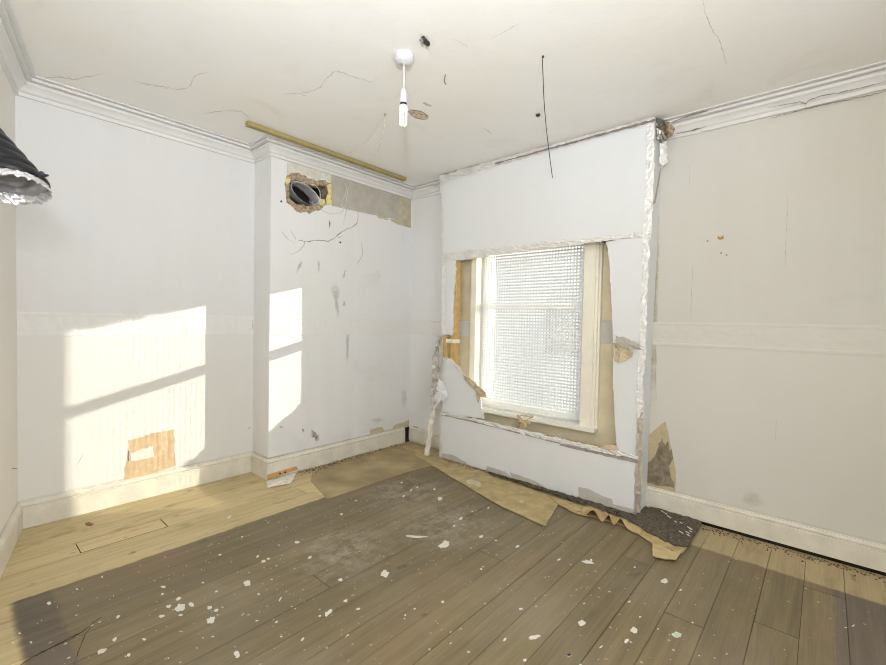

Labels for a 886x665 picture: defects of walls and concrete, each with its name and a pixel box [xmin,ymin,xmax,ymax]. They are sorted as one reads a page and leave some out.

crack [282,71,377,96]
crack [768,82,886,118]
spalling [664,121,675,139]
hole [285,172,332,214]
crack [282,209,363,264]